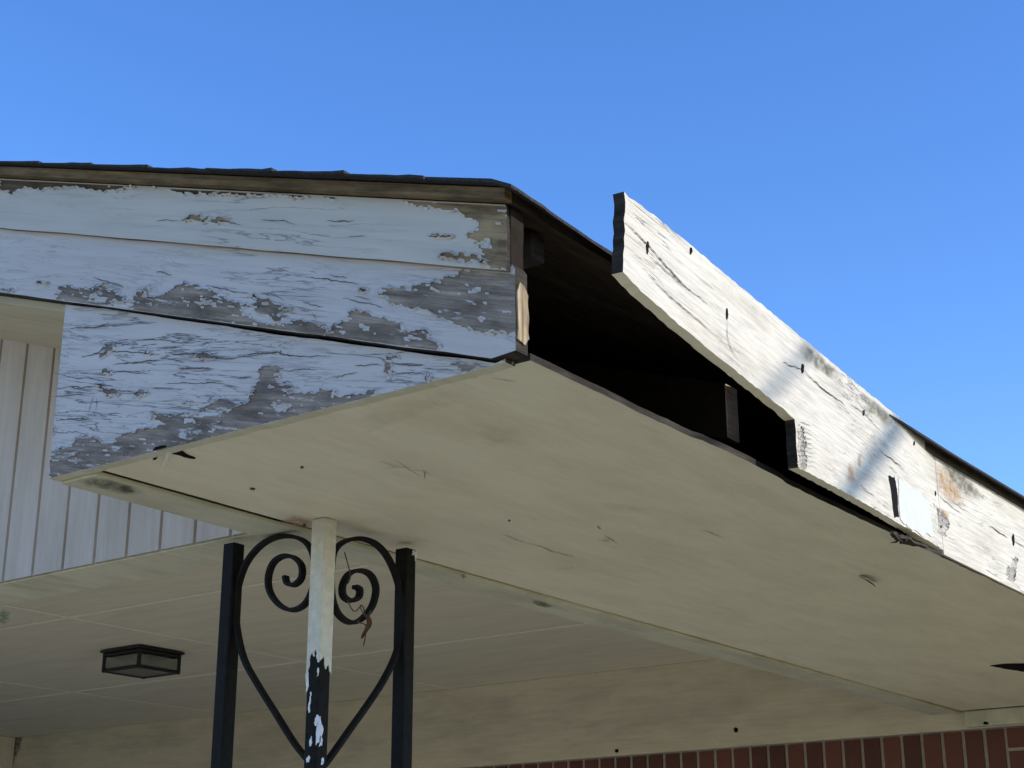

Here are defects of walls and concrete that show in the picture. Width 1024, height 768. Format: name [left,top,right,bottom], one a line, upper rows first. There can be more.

peeling [0,180,136,196]
peeling [152,186,338,201]
peeling [35,201,516,478]
peeling [305,667,324,765]